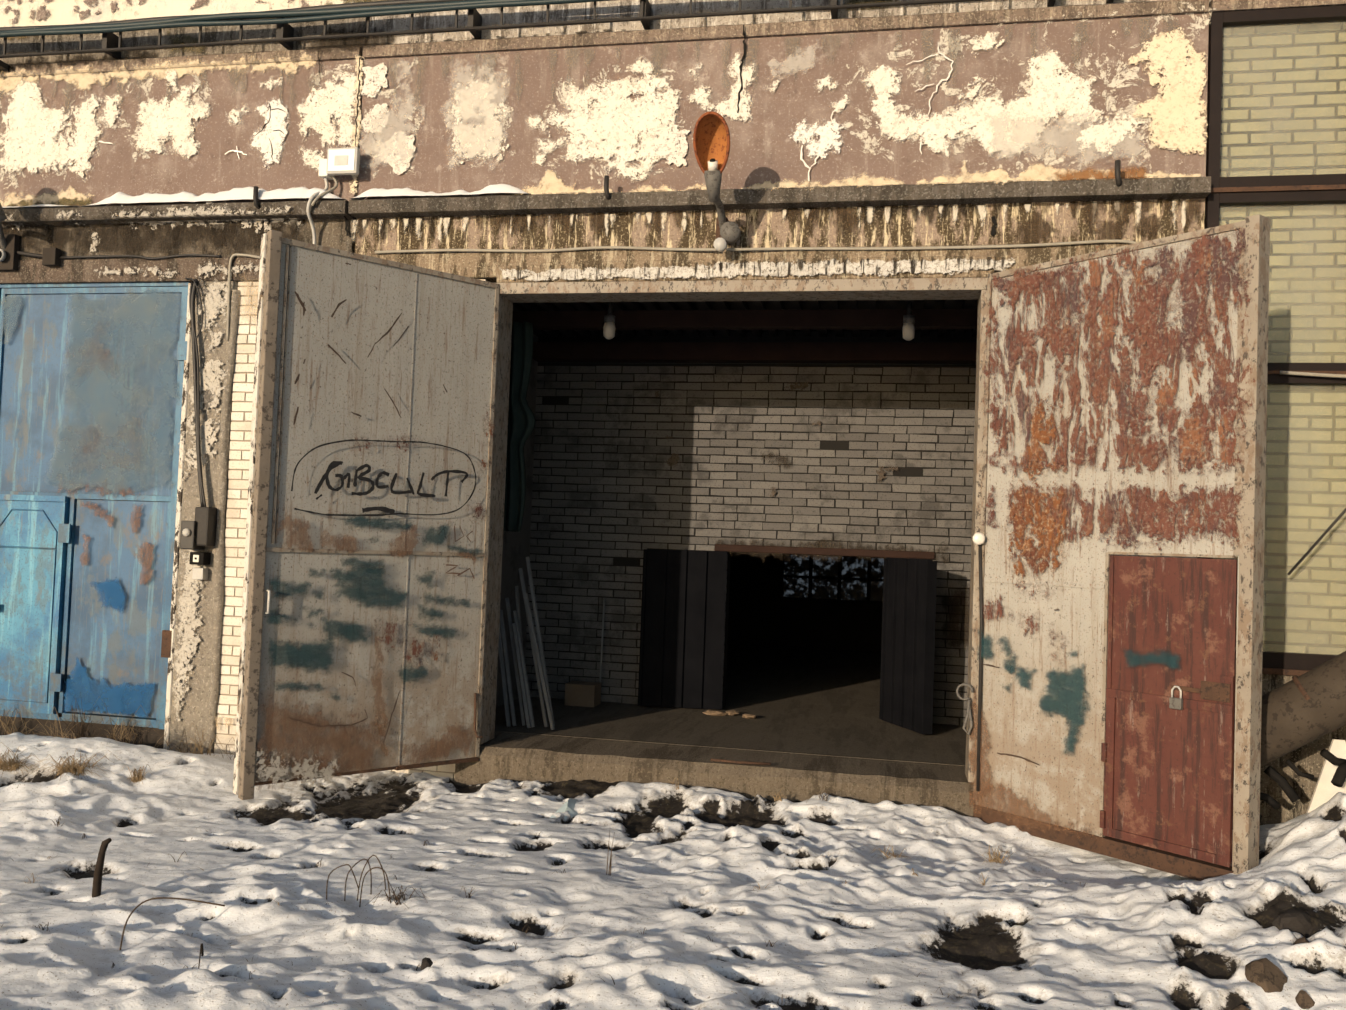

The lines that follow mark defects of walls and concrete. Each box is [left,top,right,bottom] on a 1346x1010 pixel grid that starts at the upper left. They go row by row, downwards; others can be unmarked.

peeling [111,202,301,233]
peeling [0,54,422,194]
peeling [443,62,516,169]
peeling [528,52,781,186]
leakage [695,258,848,272]
leakage [741,161,1110,189]
leakage [782,200,1201,243]
peeling [789,1,1216,178]
leakage [1127,171,1201,179]
peeling [178,260,259,481]
corrosion [59,484,154,585]
corrosion [1004,397,1072,581]